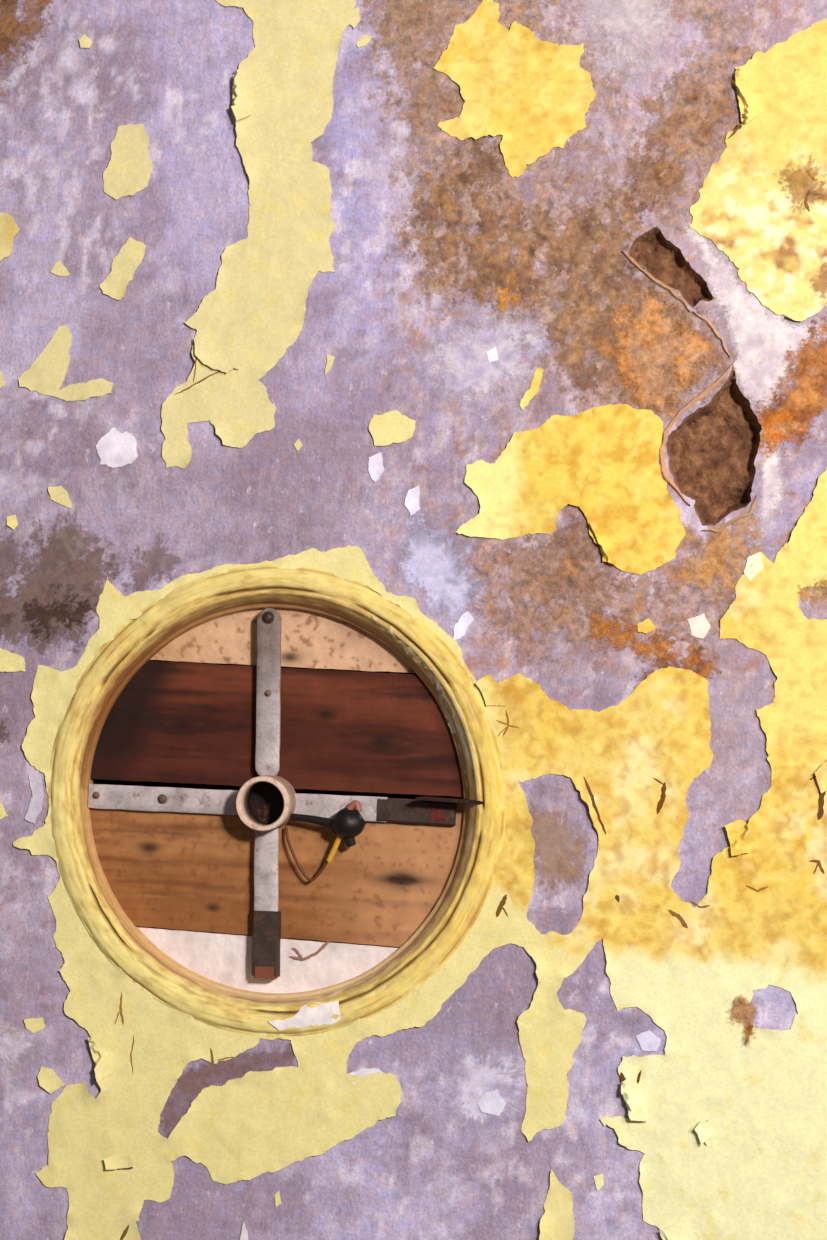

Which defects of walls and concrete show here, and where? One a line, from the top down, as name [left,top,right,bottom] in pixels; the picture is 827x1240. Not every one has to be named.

rust [0,0,53,103]
peeling [434,0,596,177]
peeling [161,0,356,469]
rust [360,0,763,425]
flaking render [96,427,138,468]
flaking render [368,452,384,482]
peeling [455,227,762,575]
rust [756,317,827,457]
leakage [0,512,180,655]
rust [444,504,763,680]
peeling [13,469,827,1240]
rust [731,996,758,1045]